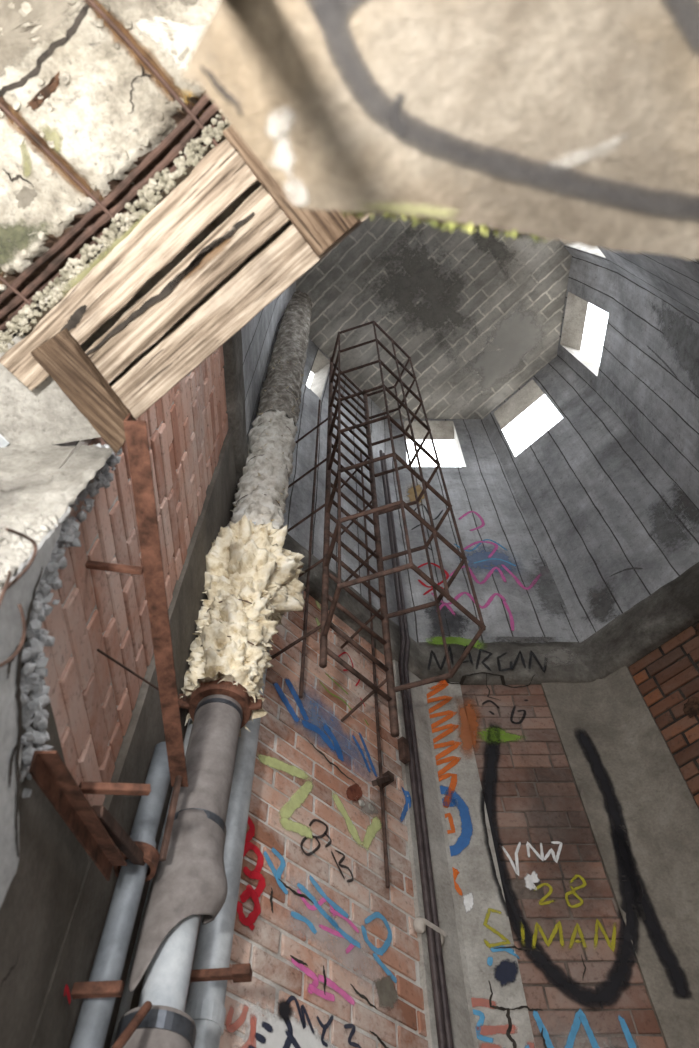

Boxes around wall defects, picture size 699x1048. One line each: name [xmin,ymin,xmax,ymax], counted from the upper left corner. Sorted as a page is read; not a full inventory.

crack [0,3,90,97]
crack [128,51,161,114]
crack [3,169,34,188]
spalling [0,0,231,353]
water stain [375,231,478,356]
spalling [0,441,122,798]
crack [488,981,547,1048]